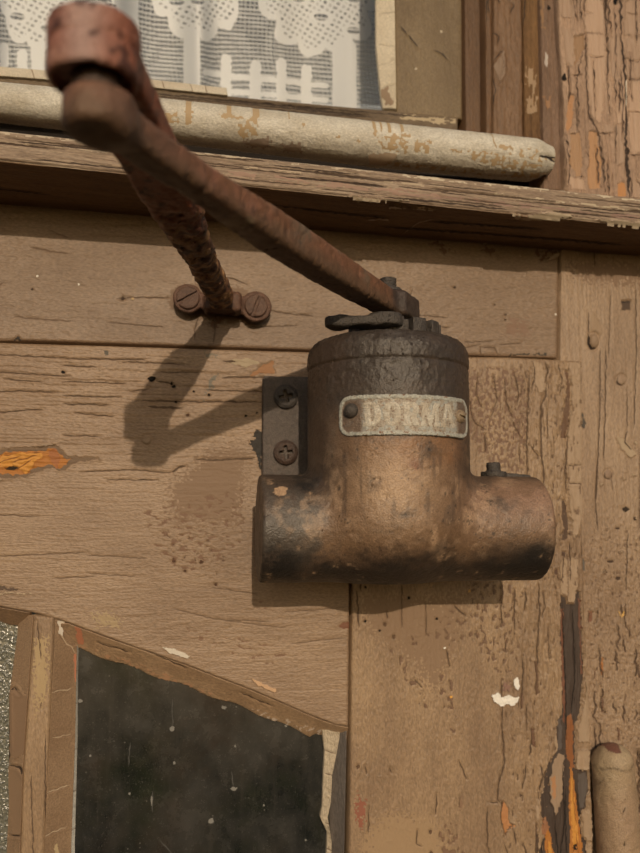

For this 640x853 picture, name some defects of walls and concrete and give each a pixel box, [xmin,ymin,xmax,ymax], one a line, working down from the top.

peeling [219,105,260,139]
crack [157,93,416,118]
peeling [372,114,456,154]
peeling [383,134,547,178]
peeling [525,66,551,114]
crack [469,361,563,484]
crack [565,293,637,526]
peeling [428,360,640,853]
crack [487,489,640,853]